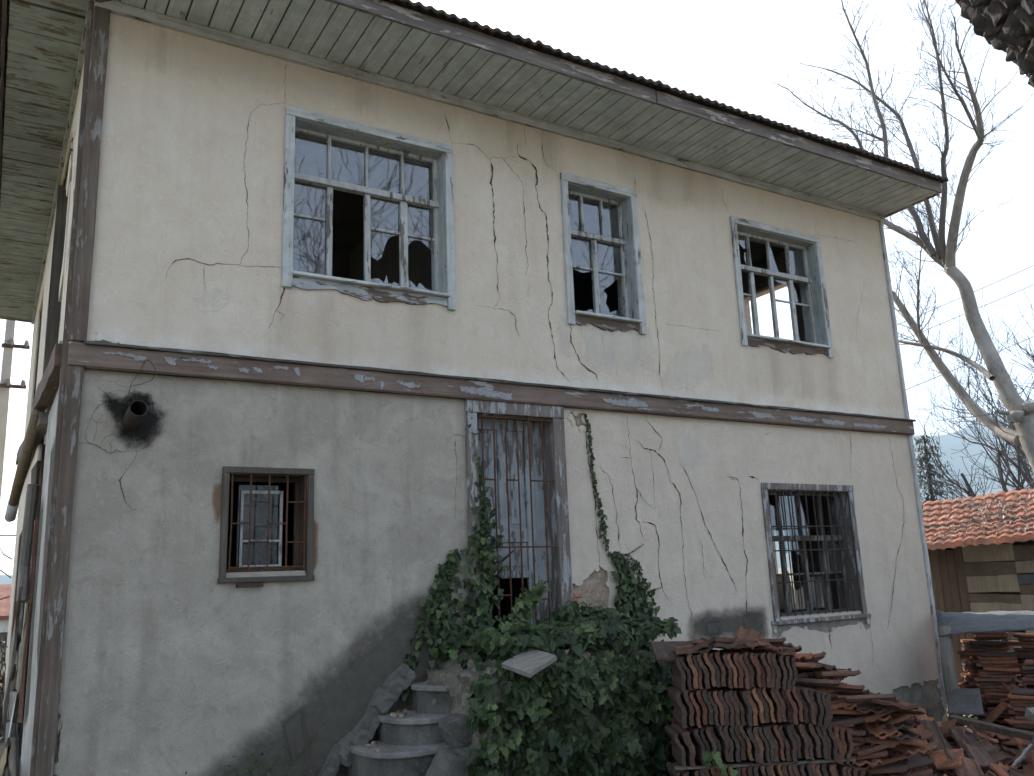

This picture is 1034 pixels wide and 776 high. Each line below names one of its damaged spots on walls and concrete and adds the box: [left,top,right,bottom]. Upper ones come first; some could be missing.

crack [165,60,287,328]
crack [445,117,599,383]
peeling [95,333,147,361]
leakage [108,393,153,419]
peeling [238,366,300,376]
peeling [354,374,421,389]
peeling [460,386,512,400]
peeling [602,398,648,407]
peeling [789,416,886,429]
crack [79,380,157,510]
crack [576,419,758,625]
spalling [572,566,610,612]